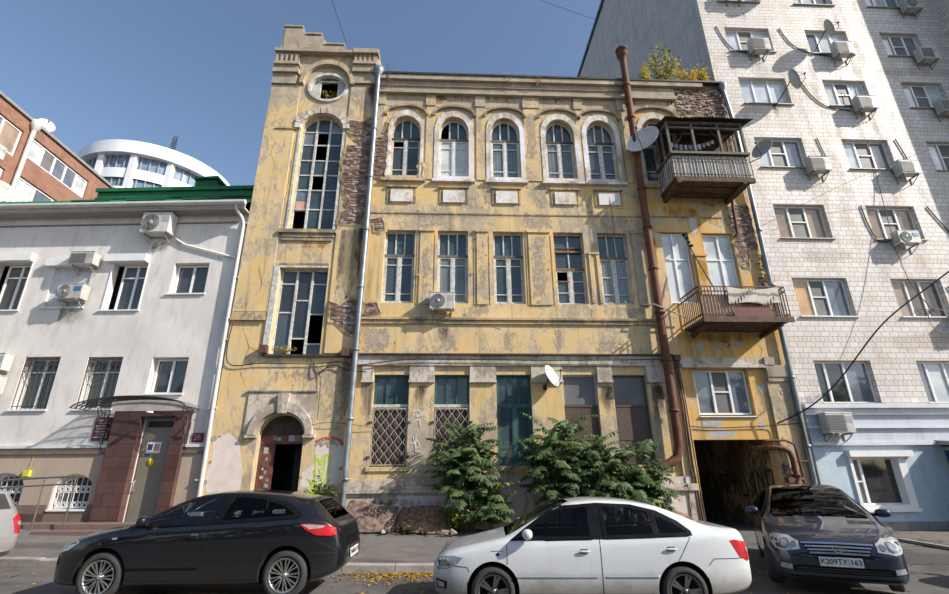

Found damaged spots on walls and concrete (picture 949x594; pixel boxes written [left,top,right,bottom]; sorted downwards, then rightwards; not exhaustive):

flaking render [674,86,729,118]
flaking render [335,88,394,236]
flaking render [724,202,768,289]
flaking render [326,295,397,353]
flaking render [204,433,243,495]